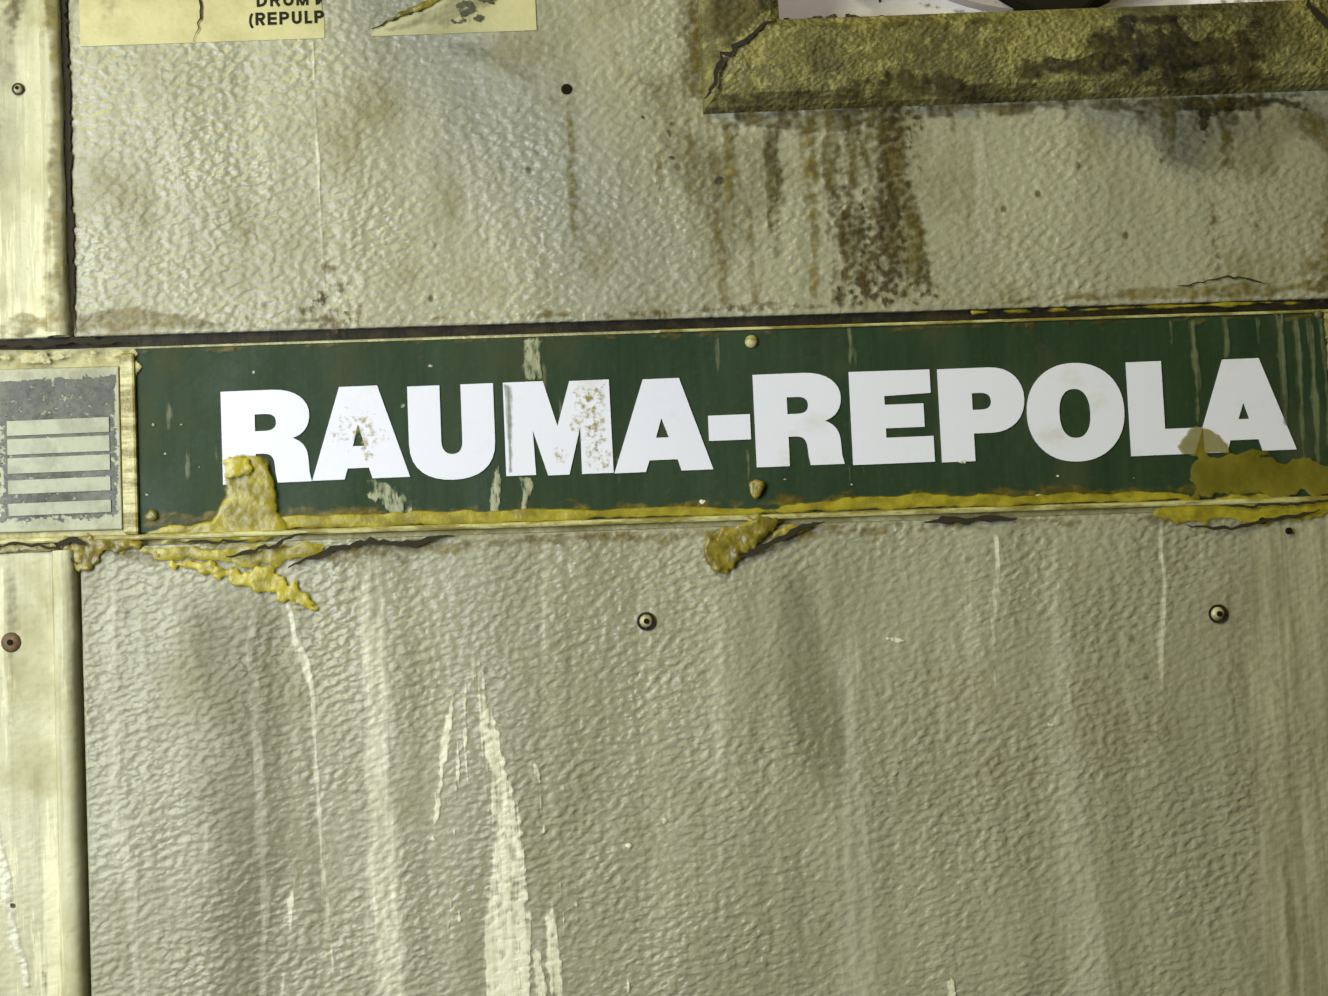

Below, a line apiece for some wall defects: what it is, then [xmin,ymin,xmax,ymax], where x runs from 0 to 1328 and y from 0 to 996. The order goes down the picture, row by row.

crack [193,0,202,42]
crack [704,19,777,99]
leakage [1198,96,1237,168]
leakage [430,652,564,996]